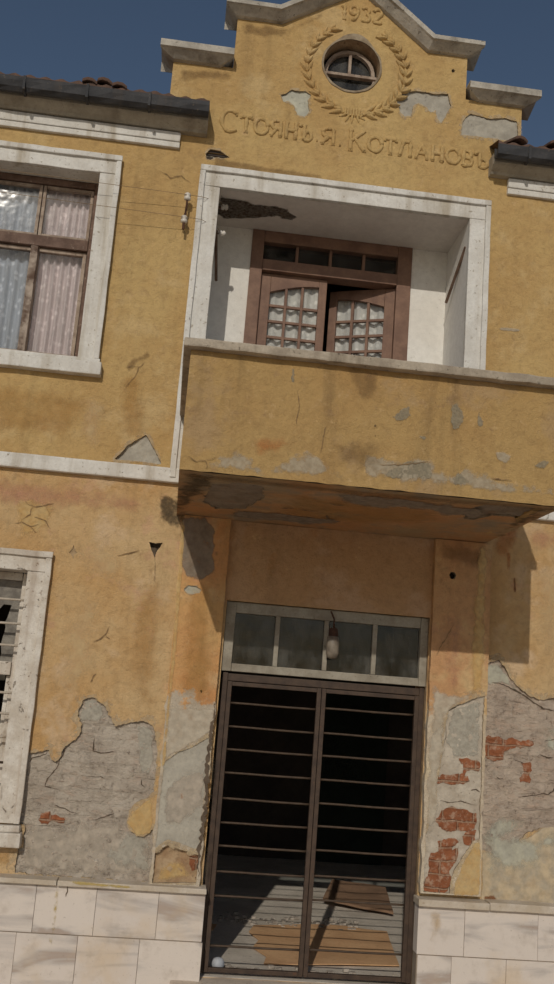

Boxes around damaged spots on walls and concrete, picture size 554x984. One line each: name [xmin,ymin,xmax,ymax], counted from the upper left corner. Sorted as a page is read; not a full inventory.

spalling [281,88,311,117]
spalling [397,88,452,123]
spalling [459,110,521,143]
spalling [113,434,161,466]
peeling [182,517,215,595]
spalling [6,694,216,885]
spalling [423,653,554,894]